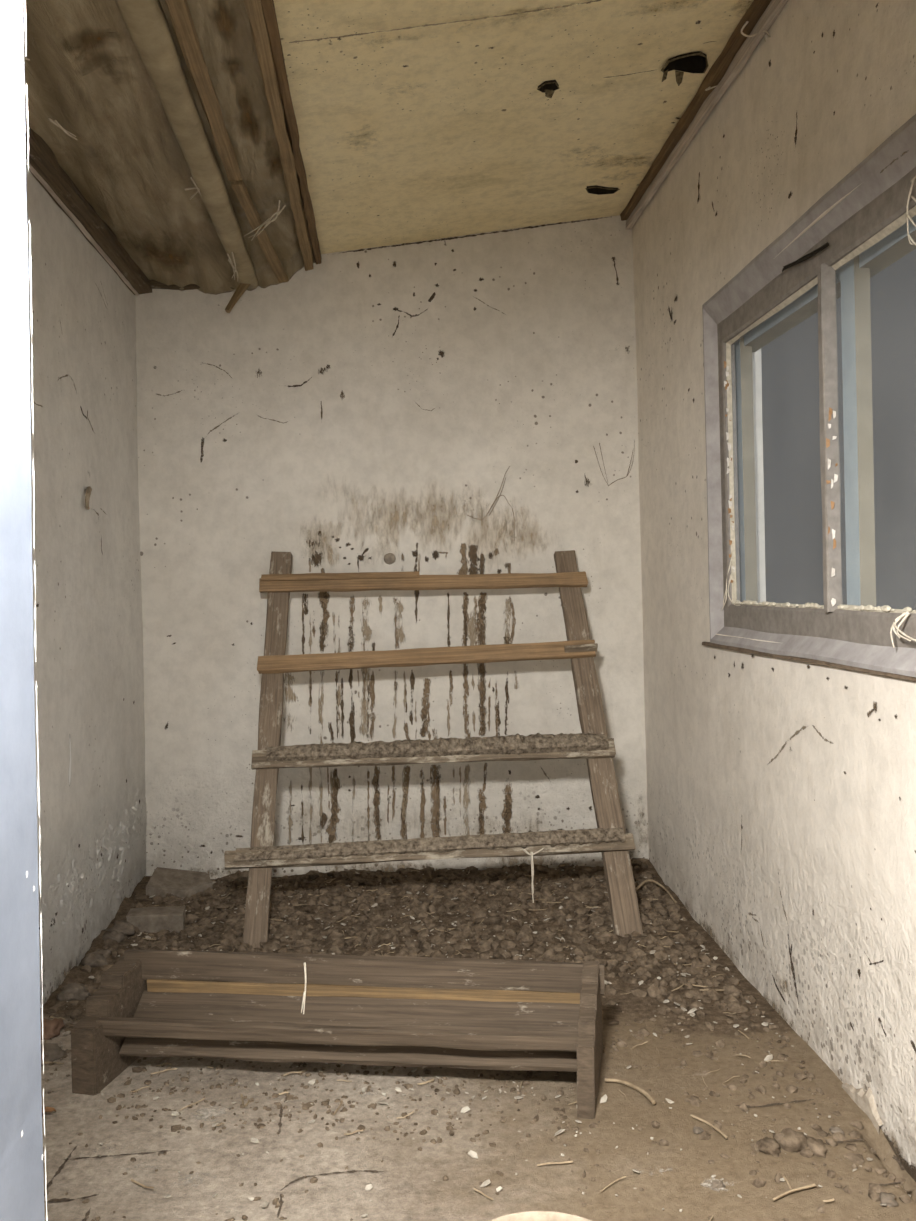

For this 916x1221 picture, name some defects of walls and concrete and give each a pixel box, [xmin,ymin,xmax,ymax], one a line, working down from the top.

crack [289,0,600,43]
water stain [306,531,371,573]
water stain [401,502,511,575]
water stain [302,590,419,654]
water stain [447,592,487,647]
water stain [503,598,516,644]
water stain [284,668,376,744]
water stain [392,663,518,740]
water stain [288,763,487,844]
water stain [501,770,513,833]